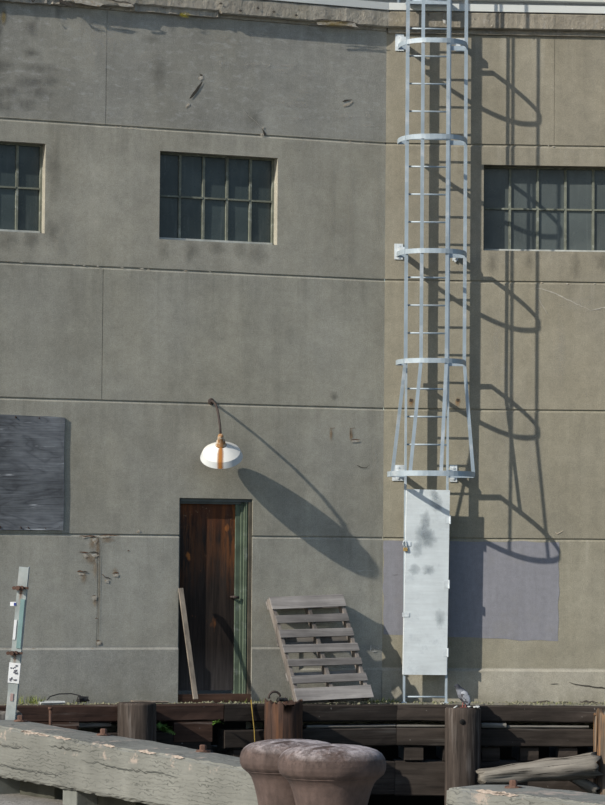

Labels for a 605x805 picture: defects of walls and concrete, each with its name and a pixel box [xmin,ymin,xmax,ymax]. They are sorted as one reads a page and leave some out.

spalling [315,19,365,28]
crack [534,682,605,703]